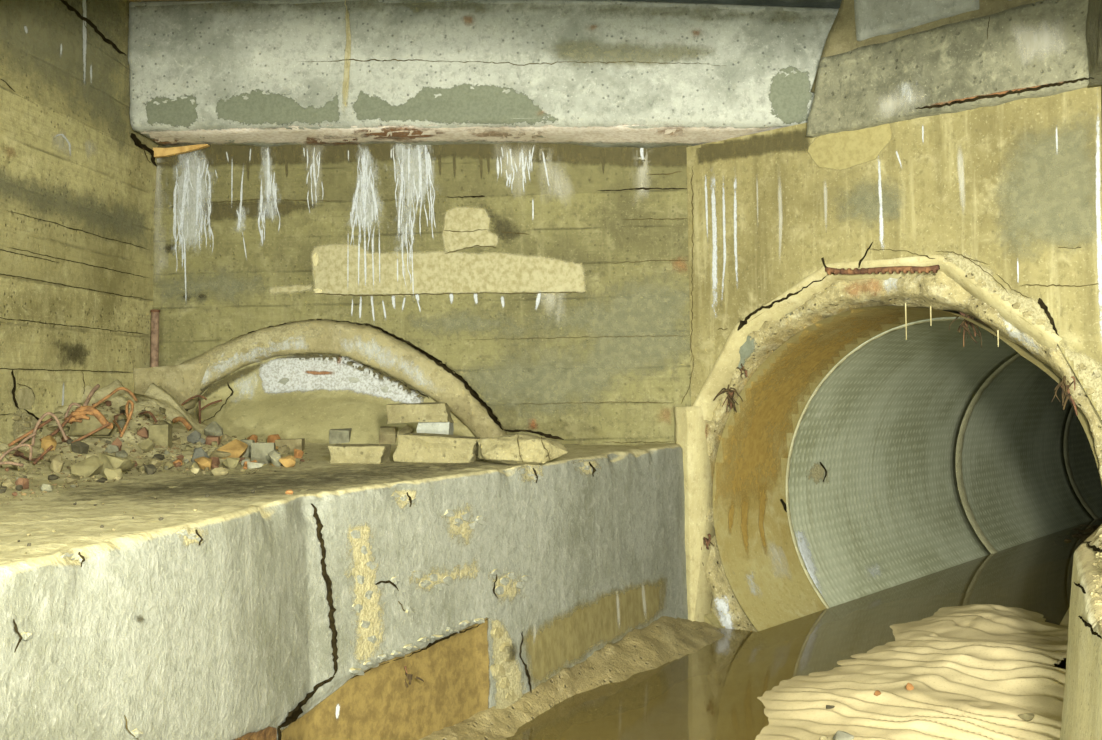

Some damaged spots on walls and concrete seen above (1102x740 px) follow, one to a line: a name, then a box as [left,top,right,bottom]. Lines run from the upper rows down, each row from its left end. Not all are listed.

crack [60,0,127,56]
peeling [144,94,198,129]
peeling [216,89,340,126]
peeling [353,83,558,125]
peeling [769,66,813,124]
crack [915,77,1094,109]
leakage [141,124,809,331]
leakage [845,162,900,247]
leakage [1002,121,1102,332]
crack [467,166,1100,405]
crack [231,292,585,461]
crack [277,504,339,740]